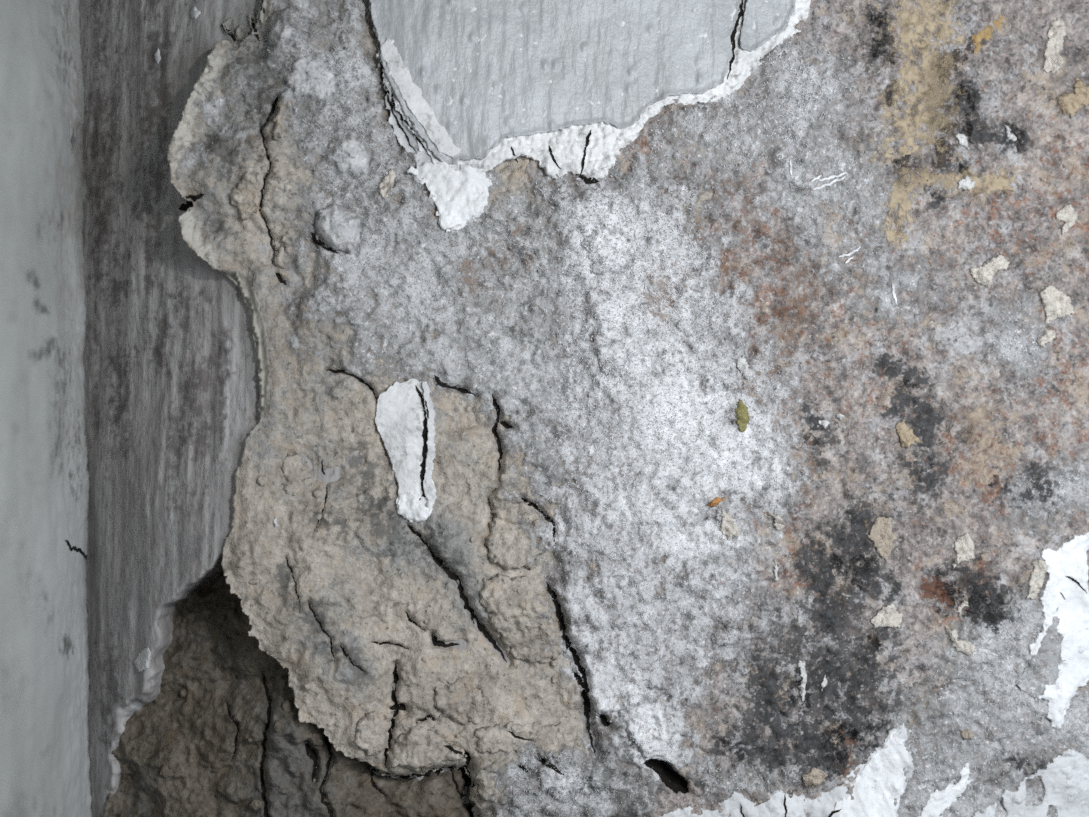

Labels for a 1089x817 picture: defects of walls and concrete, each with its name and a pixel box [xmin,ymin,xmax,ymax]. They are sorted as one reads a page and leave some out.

damp [141,32,170,148]
damp [960,82,1032,154]
crack [259,97,287,285]
peeling [373,169,416,214]
crack [434,375,513,471]
damp [176,0,947,817]
spalling [582,556,605,607]
spalling [653,555,688,599]
crack [371,525,507,817]
crack [546,581,610,753]
damp [800,558,1089,817]
peeling [917,739,1089,817]